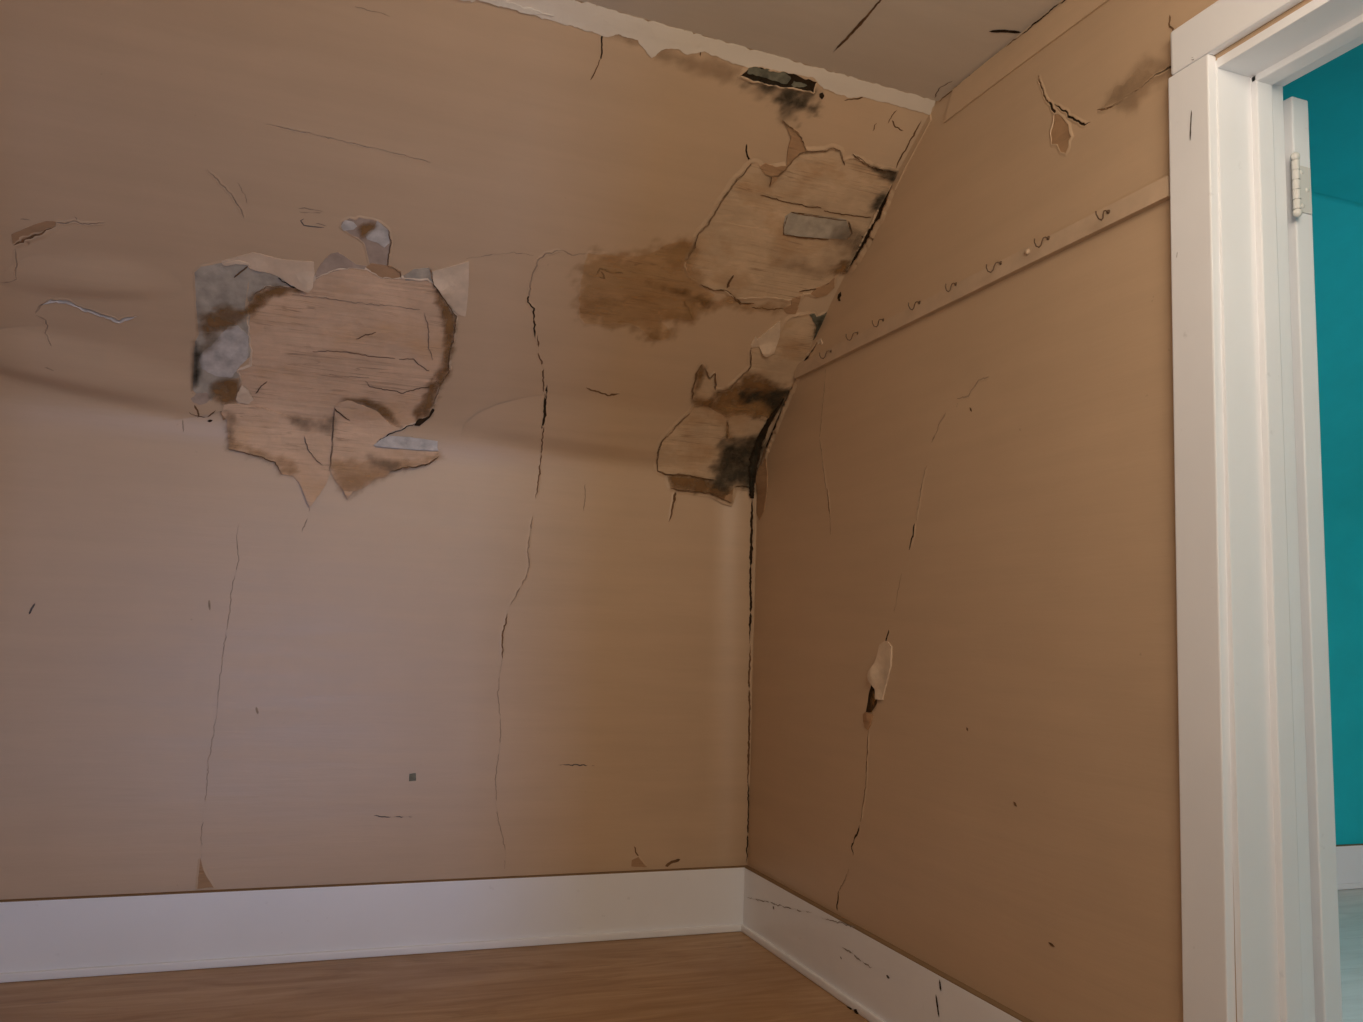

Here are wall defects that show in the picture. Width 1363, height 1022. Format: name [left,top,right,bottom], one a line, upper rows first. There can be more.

leakage [750,79,817,110]
crack [989,0,1065,53]
crack [0,217,106,285]
crack [35,298,137,371]
peeling [182,215,469,531]
peeling [653,121,899,523]
crack [847,180,895,278]
crack [195,525,239,891]
crack [467,248,597,869]
crack [746,336,823,863]
crack [836,730,870,911]
crack [885,374,990,642]